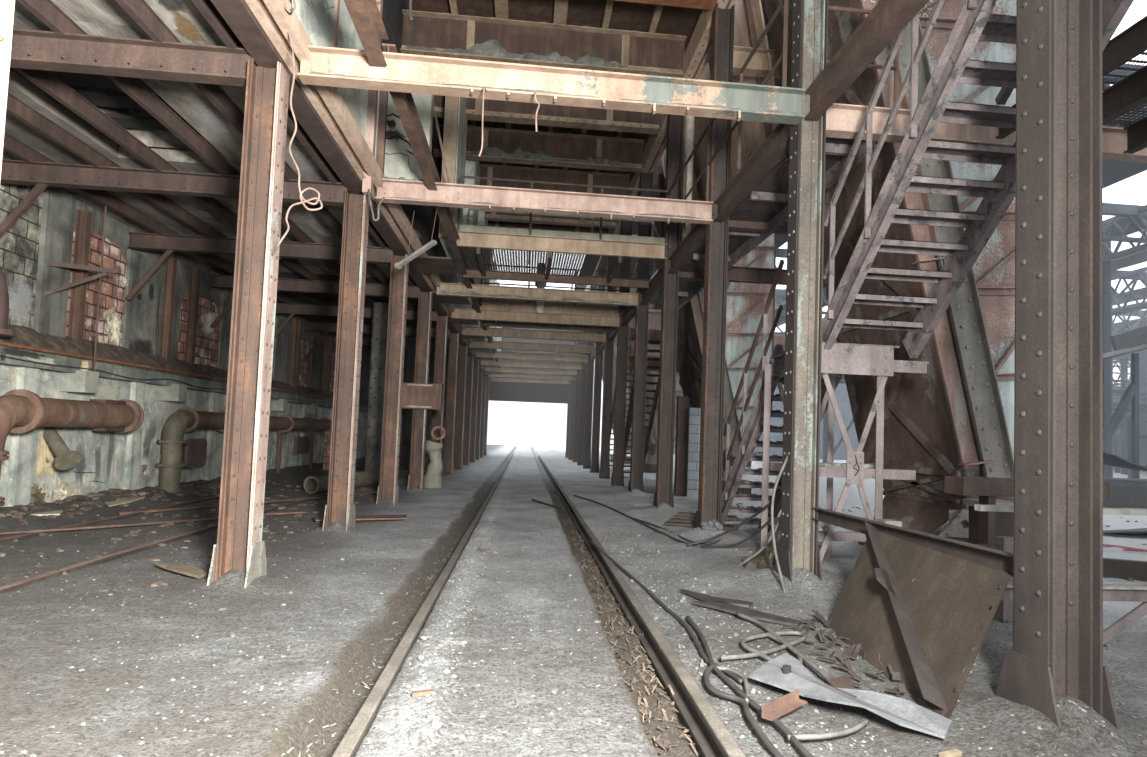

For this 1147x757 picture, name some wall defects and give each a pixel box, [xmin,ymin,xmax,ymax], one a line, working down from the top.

water stain [173,10,204,42]
peeling [89,308,122,346]
peeling [201,311,218,336]